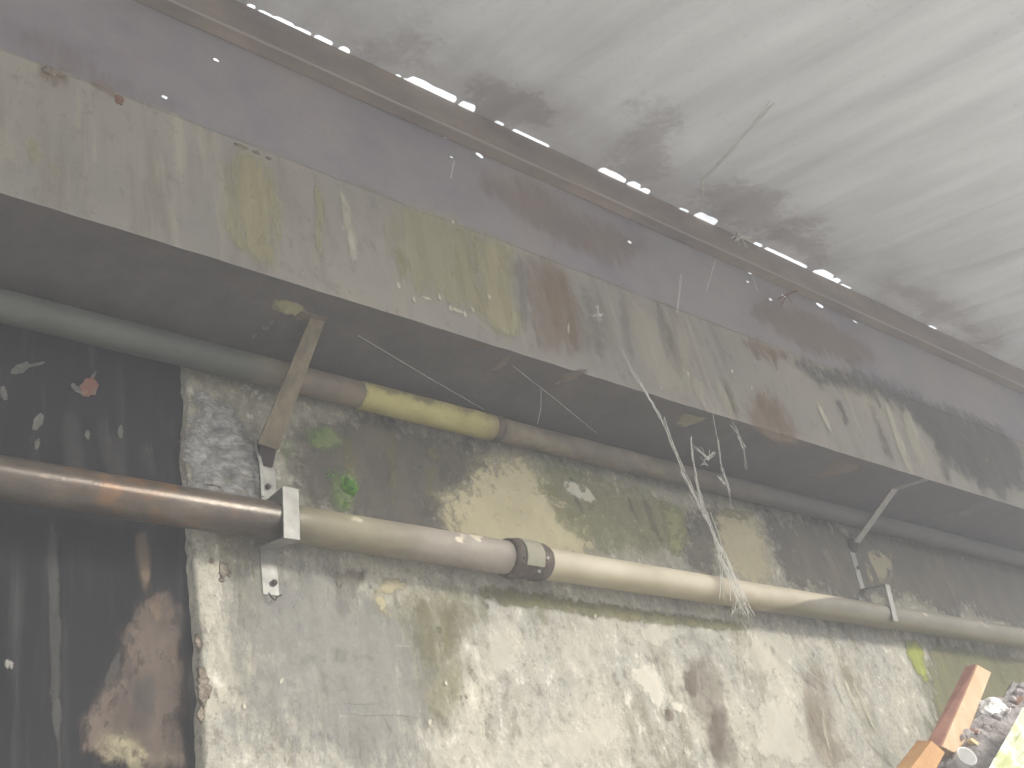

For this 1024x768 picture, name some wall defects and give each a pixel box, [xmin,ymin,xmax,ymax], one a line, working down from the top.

damp [291,413,488,530]
damp [685,504,720,575]
peeling [82,591,212,768]